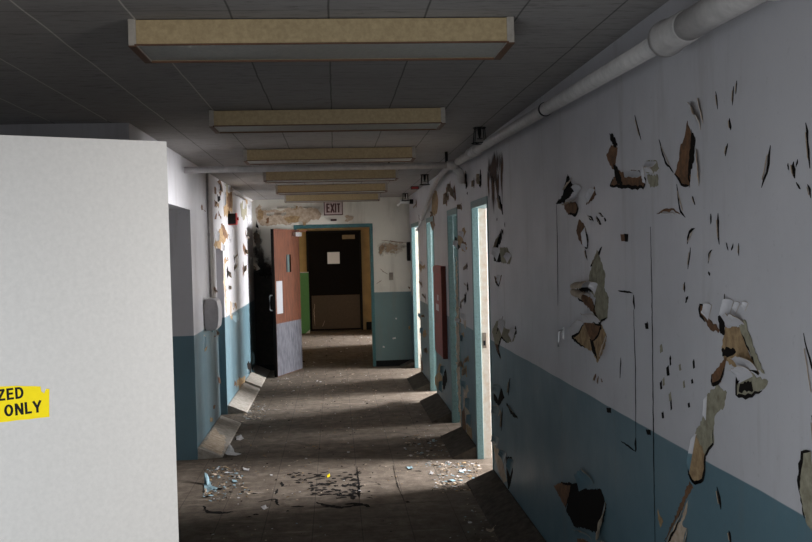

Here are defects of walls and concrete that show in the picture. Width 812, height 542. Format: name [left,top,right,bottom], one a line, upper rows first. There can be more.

peeling [606,133,646,190]
peeling [674,98,703,187]
peeling [213,180,321,322]
peeling [491,247,512,264]
peeling [556,175,609,363]
peeling [492,317,517,358]
peeling [657,294,768,542]
peeling [554,469,606,542]
peeling [797,450,812,531]